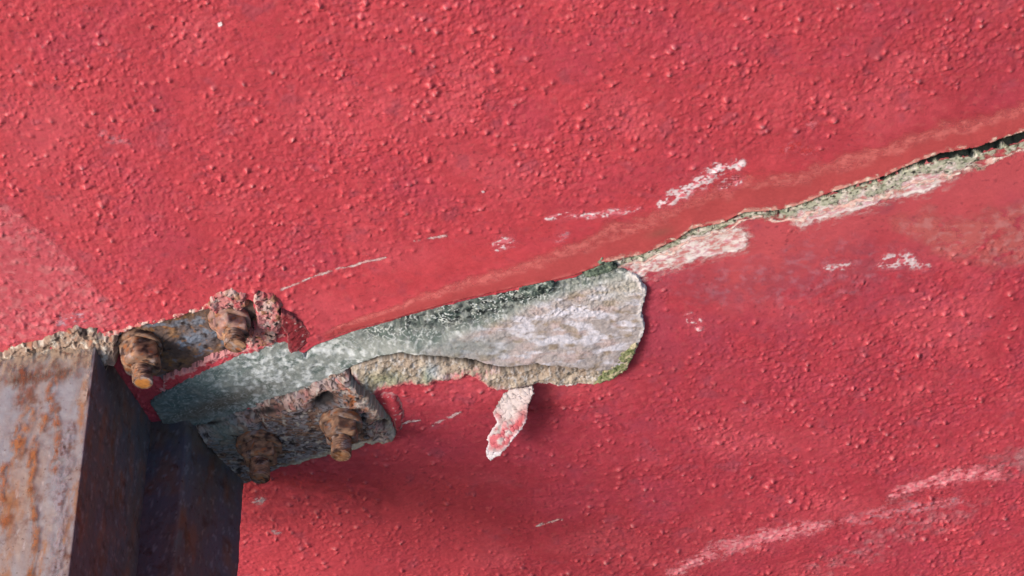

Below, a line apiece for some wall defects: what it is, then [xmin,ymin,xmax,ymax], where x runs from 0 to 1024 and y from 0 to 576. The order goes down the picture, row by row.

crack [602,129,1024,268]
peeling [796,161,966,228]
flaking render [103,228,748,461]
corrosion [5,365,72,553]